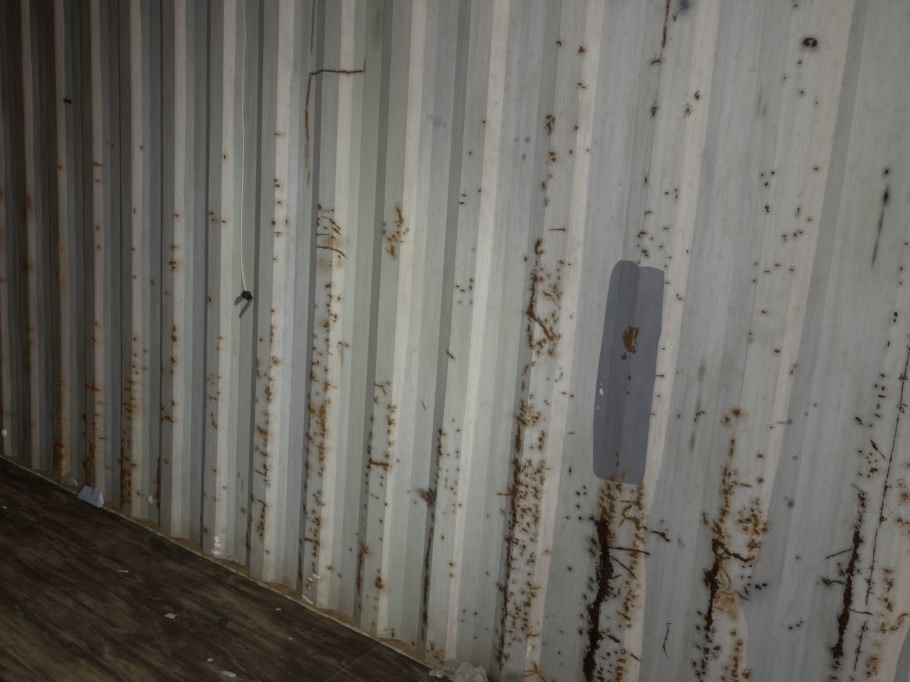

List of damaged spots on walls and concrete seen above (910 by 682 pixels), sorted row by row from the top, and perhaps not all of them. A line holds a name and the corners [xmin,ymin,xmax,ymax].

corrosion [316,204,345,266]
corrosion [383,206,405,257]
corrosion [104,336,147,510]
corrosion [246,494,271,556]
corrosion [254,356,281,488]
corrosion [298,281,348,591]
corrosion [350,518,385,611]
corrosion [365,382,399,506]
corrosion [494,239,571,669]
corrosion [566,469,655,682]
corrosion [690,403,772,682]
corrosion [822,327,910,682]